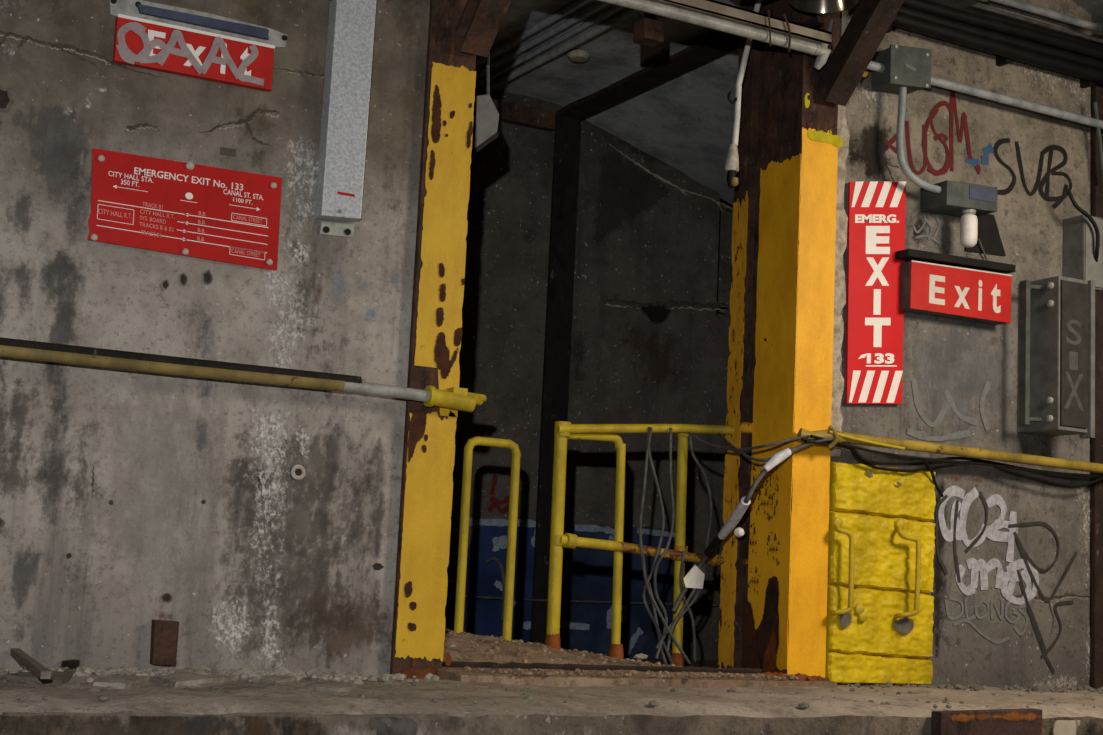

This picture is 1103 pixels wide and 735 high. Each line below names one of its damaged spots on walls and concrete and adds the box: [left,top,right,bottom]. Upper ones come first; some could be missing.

crack [0,31,163,77]
crack [125,123,158,132]
crack [198,107,279,146]
peeling [429,85,455,180]
leakage [0,251,82,344]
peeling [434,263,463,379]
leakage [0,361,102,508]
leakage [13,552,39,606]
leakage [211,405,392,669]
peeling [742,458,780,673]
corrosion [403,652,451,679]
corrosion [951,712,1040,722]